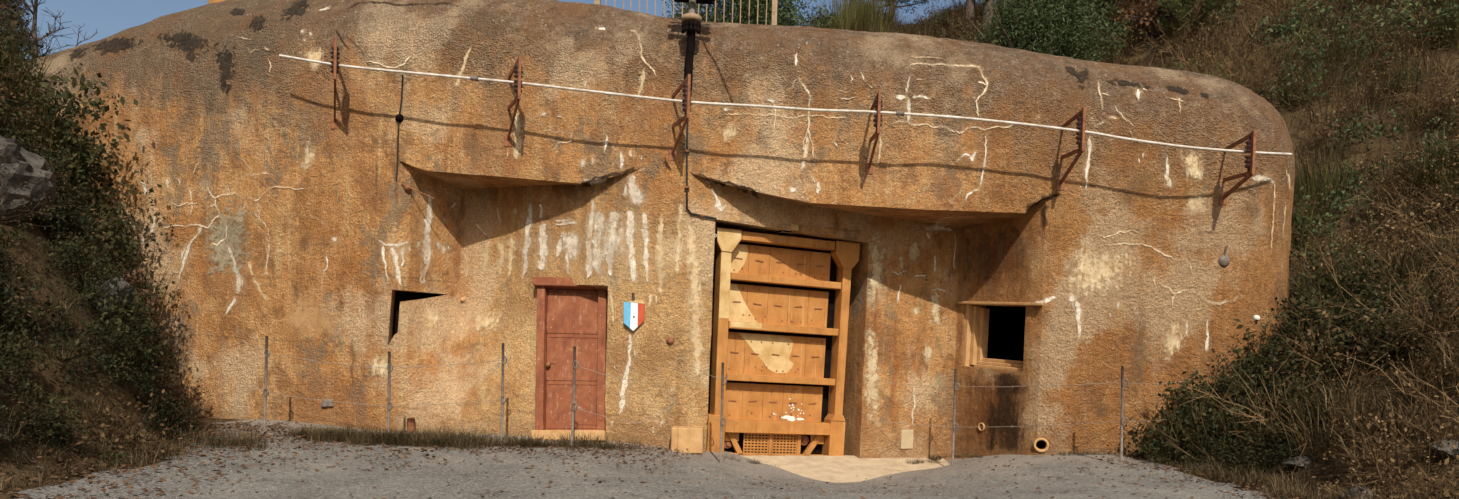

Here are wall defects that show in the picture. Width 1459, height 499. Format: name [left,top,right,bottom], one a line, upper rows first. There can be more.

water stain [379,135,703,375]
water stain [611,335,636,426]